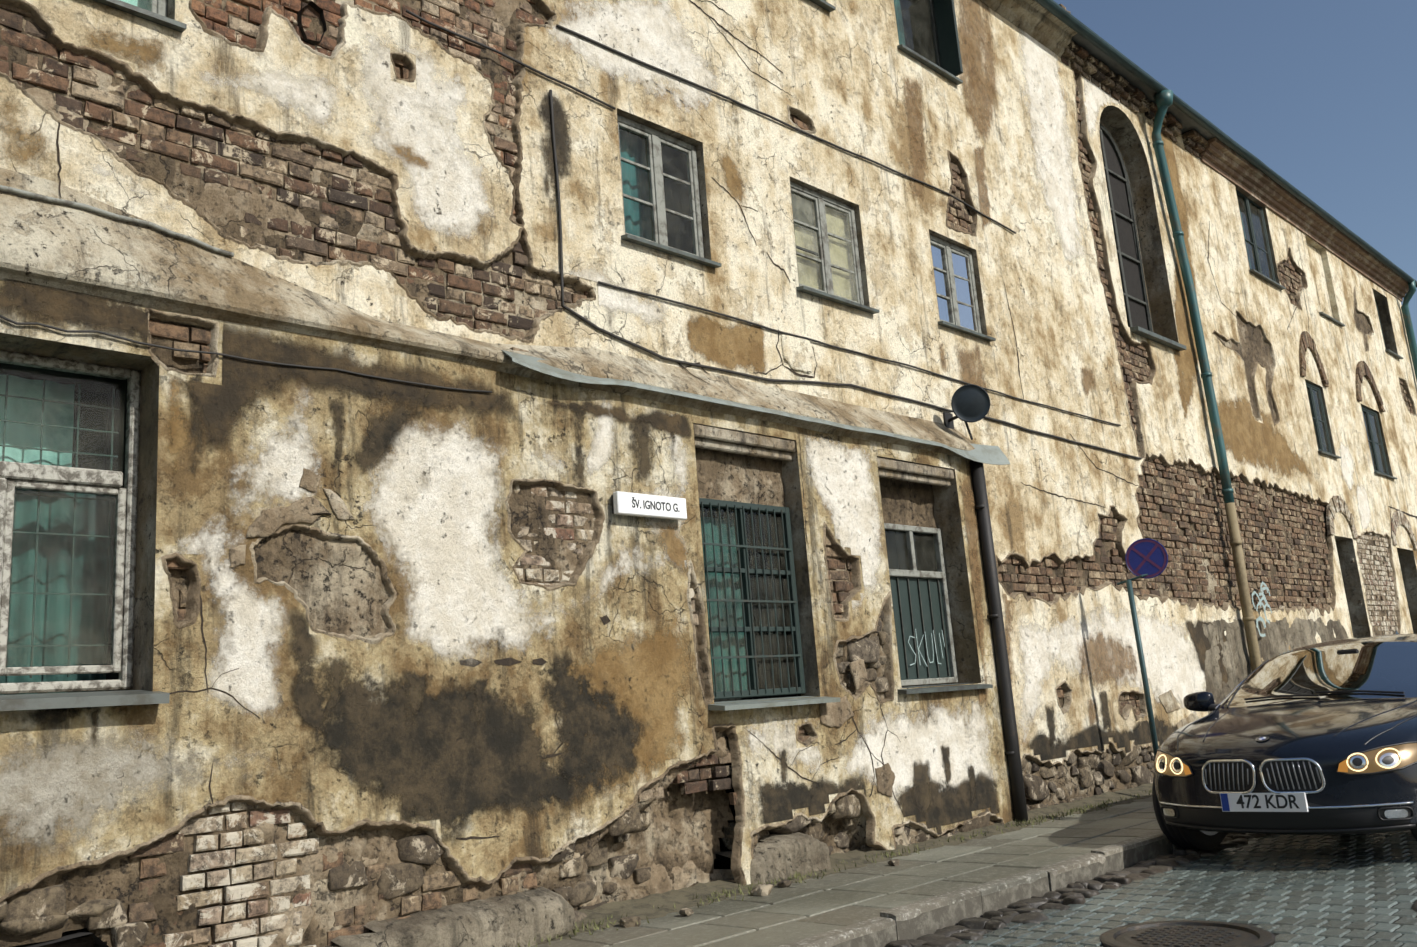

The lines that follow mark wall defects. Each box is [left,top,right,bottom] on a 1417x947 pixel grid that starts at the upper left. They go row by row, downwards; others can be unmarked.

crack [689,0,792,96]
spalling [0,0,596,352]
water stain [539,94,571,203]
spalling [946,150,978,237]
spalling [995,69,1336,616]
crack [170,571,260,719]
spalling [229,468,397,644]
water stain [291,610,689,839]
spalling [0,722,1004,947]
spalling [505,478,605,591]
crack [749,703,904,815]
spalling [796,522,895,747]